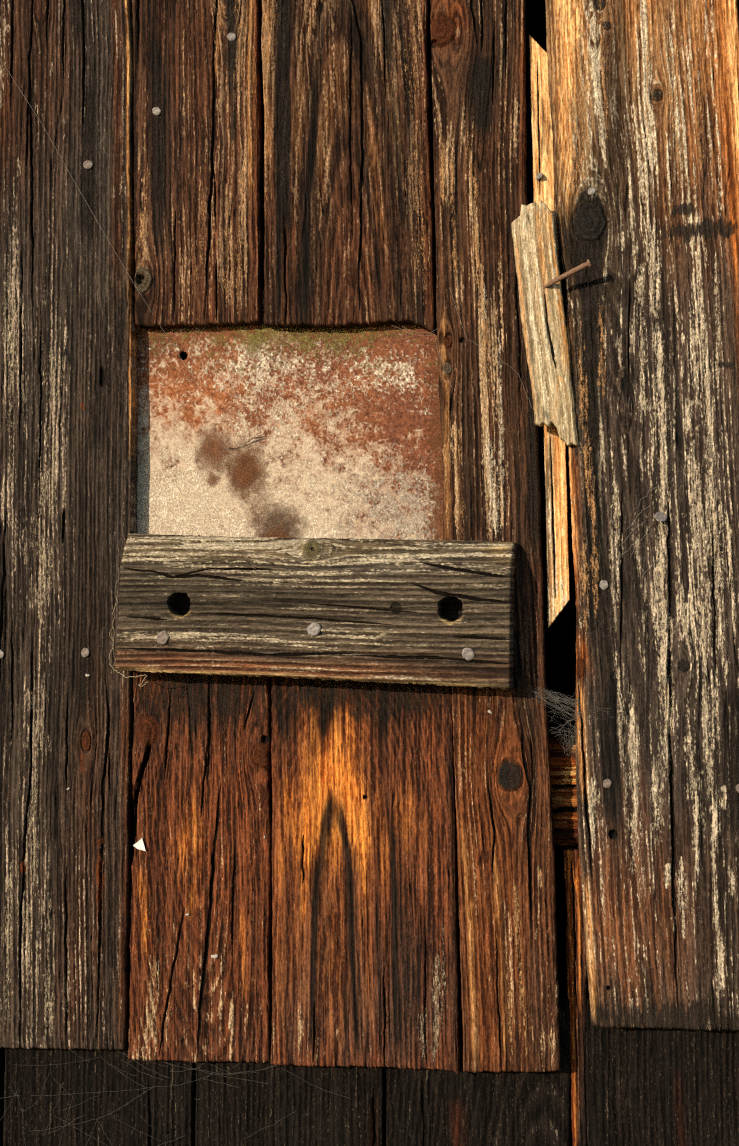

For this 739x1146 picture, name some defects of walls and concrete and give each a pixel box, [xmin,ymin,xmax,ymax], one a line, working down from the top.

crack [349,0,386,311]
corrosion [198,428,263,496]
corrosion [424,339,444,540]
corrosion [254,508,299,538]
crack [127,614,167,622]
crack [125,567,270,581]
crack [199,562,510,625]
crack [96,636,510,1146]